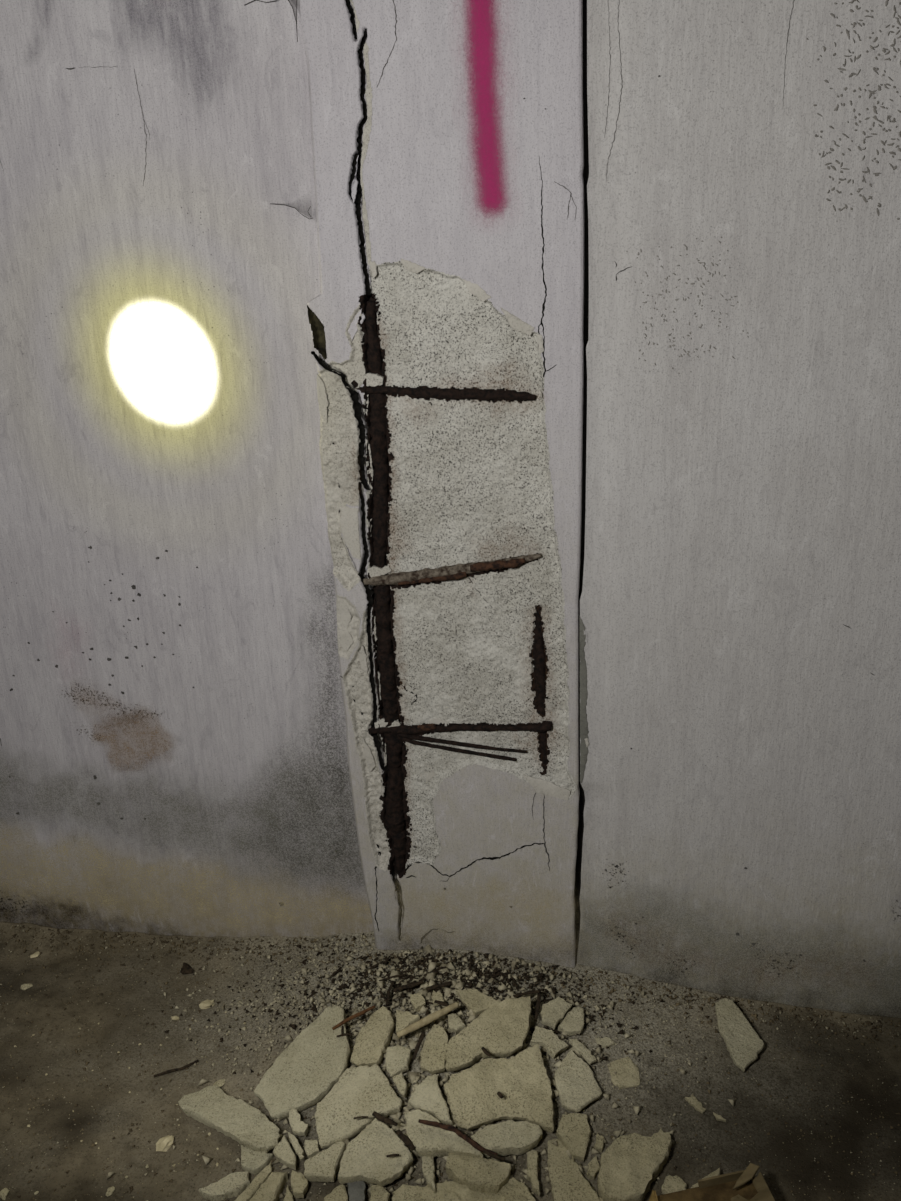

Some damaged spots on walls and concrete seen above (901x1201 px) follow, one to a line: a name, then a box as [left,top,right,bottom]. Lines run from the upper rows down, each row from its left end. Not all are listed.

crack [345,0,397,299]
crack [538,0,633,602]
spalling [307,259,589,871]
corrosion [398,558,526,585]
corrosion [417,723,436,731]
crack [374,779,585,957]